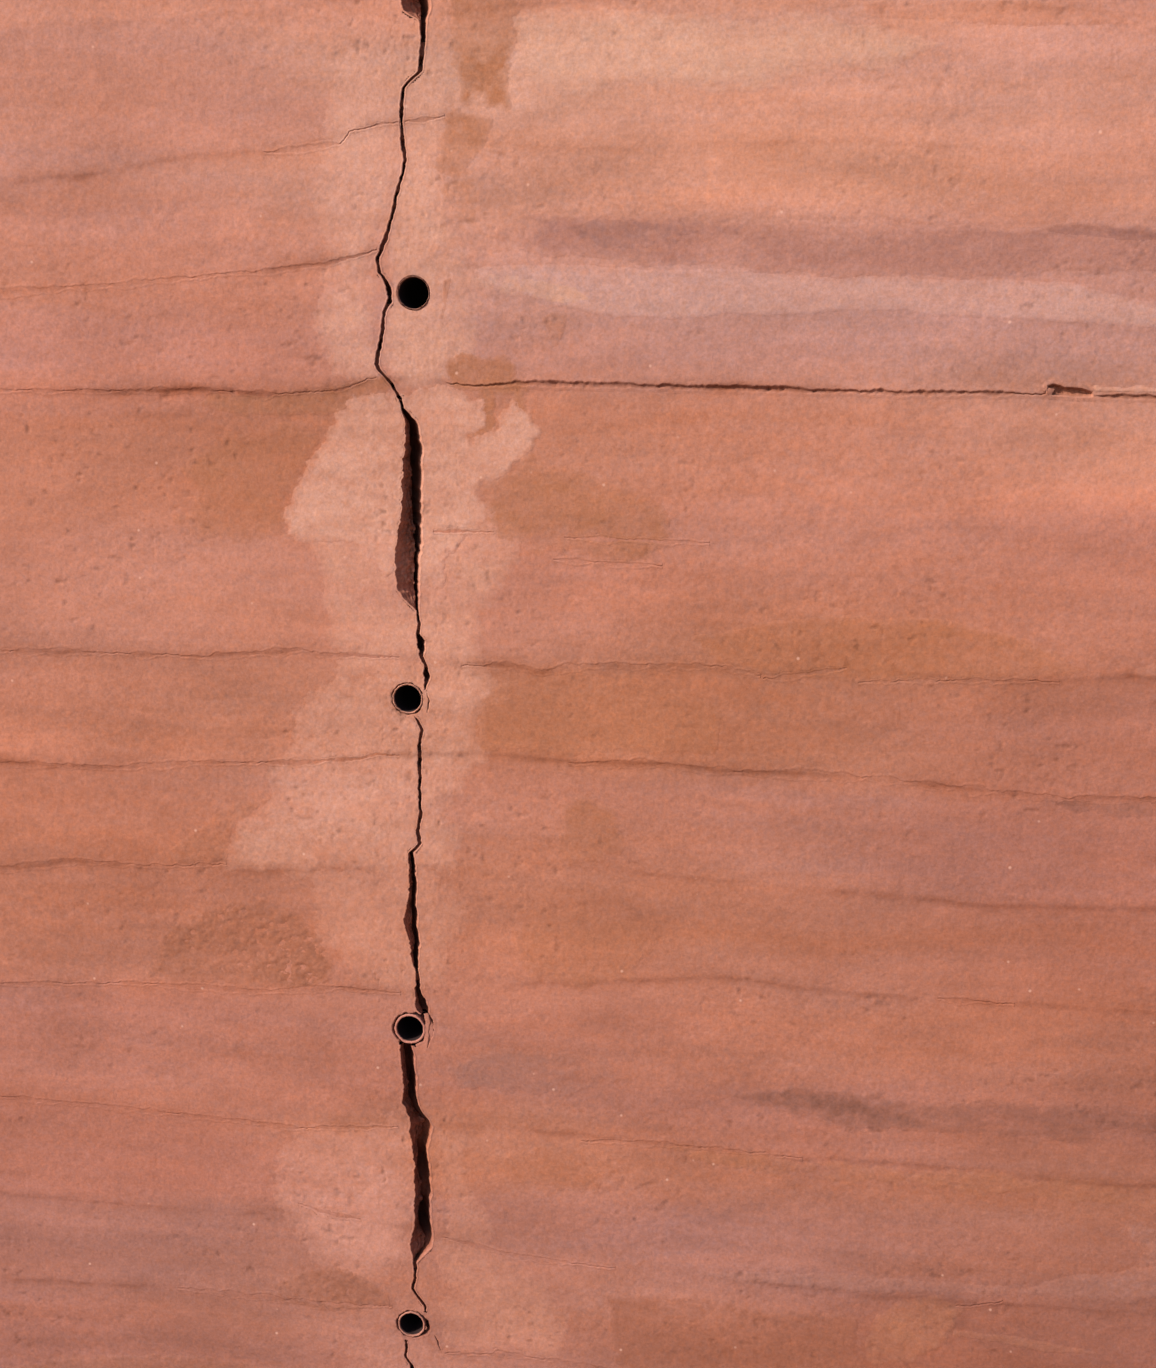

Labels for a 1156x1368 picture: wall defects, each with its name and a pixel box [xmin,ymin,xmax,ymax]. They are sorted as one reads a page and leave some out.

water stain [173,352,673,589]
crack [446,376,1054,401]
crack [1093,391,1156,404]
crack [0,0,494,1368]
water stain [309,541,723,995]
crack [763,666,1059,687]